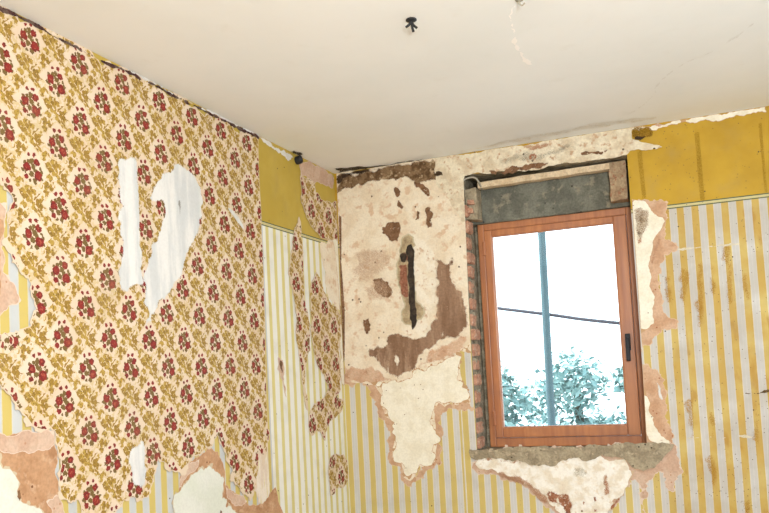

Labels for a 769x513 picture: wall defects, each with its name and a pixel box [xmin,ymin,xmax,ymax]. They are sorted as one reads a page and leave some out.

peeling [0,202,21,316]
peeling [299,127,661,487]
peeling [632,199,679,352]
peeling [0,430,65,513]
peeling [172,448,283,513]
spalling [472,363,684,513]